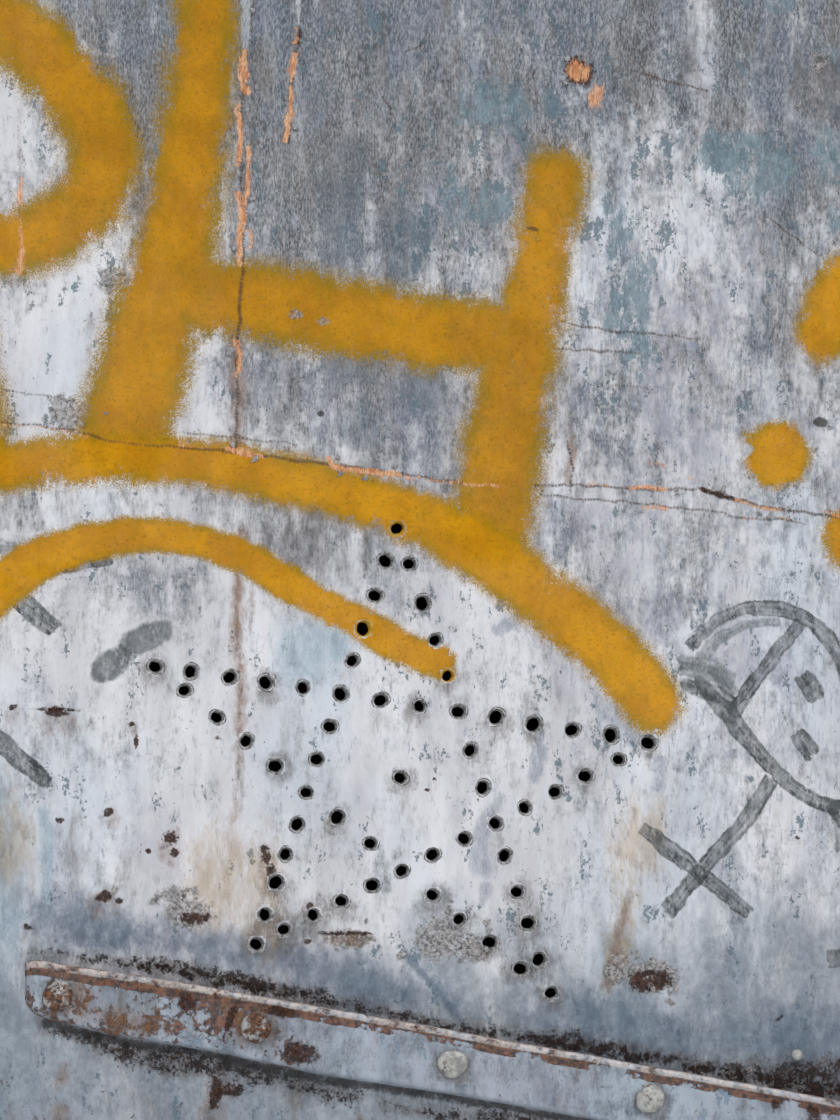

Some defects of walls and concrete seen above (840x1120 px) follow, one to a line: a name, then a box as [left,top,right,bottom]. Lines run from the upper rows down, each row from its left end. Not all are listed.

peeling [561,52,603,108]
crack [129,435,499,492]
crack [535,441,840,522]
corrosion [27,948,840,1120]